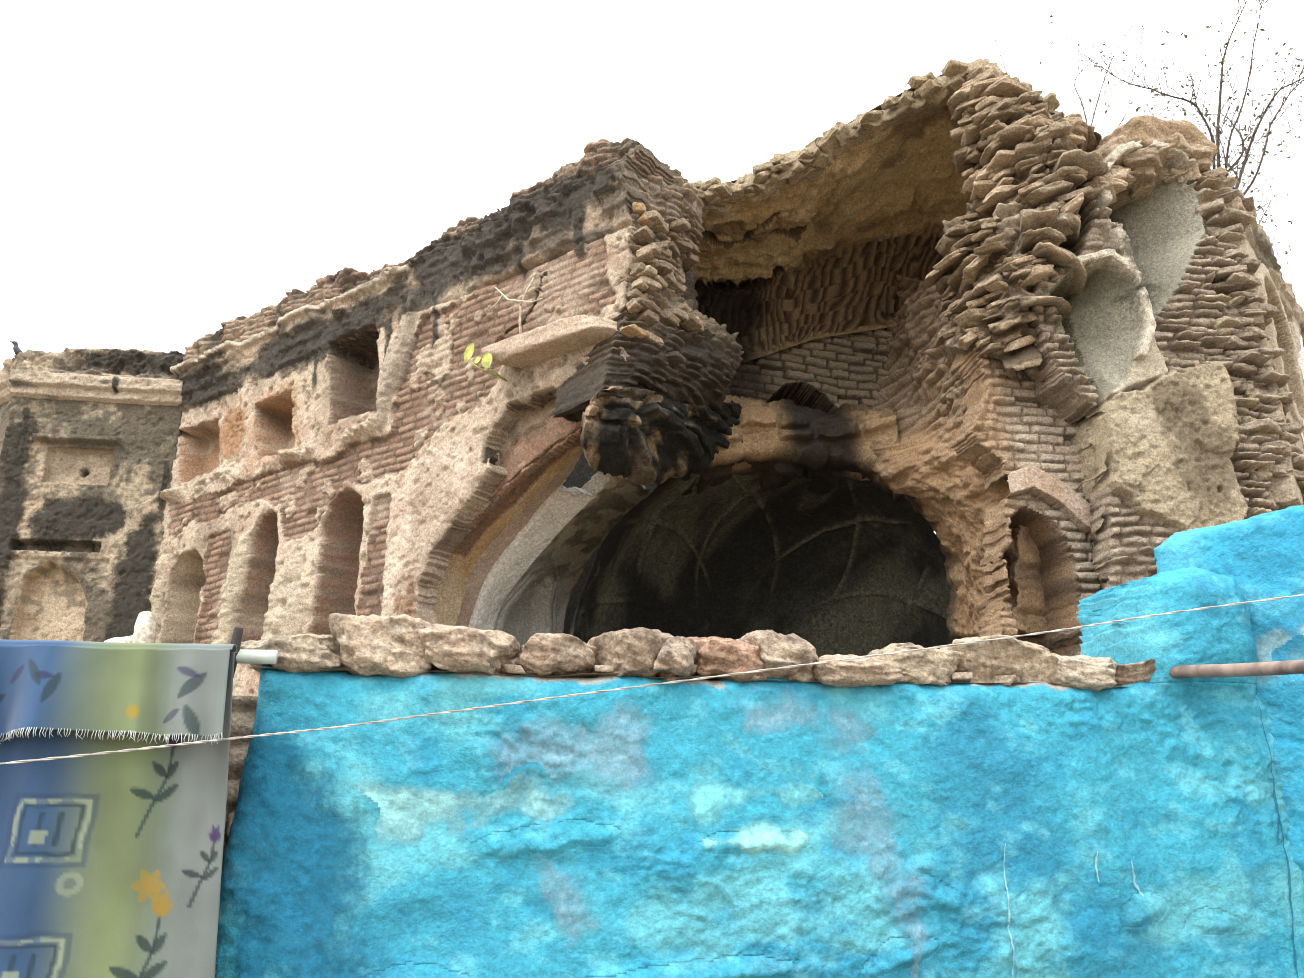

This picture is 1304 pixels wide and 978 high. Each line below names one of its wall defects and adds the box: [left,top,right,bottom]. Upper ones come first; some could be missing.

spalling [1154,216,1304,520]
spalling [870,275,1010,639]
spalling [1002,525,1047,634]
spalling [1104,483,1181,589]
peeling [1256,631,1289,662]
peeling [690,783,758,823]
peeling [704,823,809,854]
peeling [776,771,823,806]
crack [1259,706,1298,977]